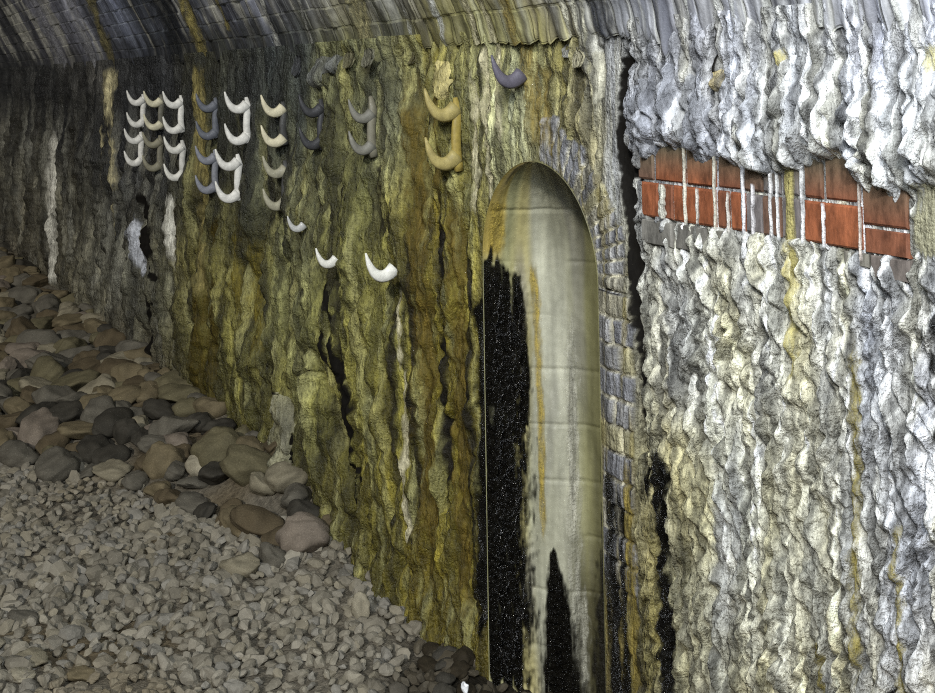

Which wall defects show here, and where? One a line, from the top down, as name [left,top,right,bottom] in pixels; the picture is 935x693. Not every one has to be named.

efflorescence [127,219,147,275]
spalling [639,146,914,283]
leakage [189,282,219,398]
leakage [386,250,453,546]
leakage [462,0,632,693]
leakage [926,314,935,396]
leakage [644,452,676,693]